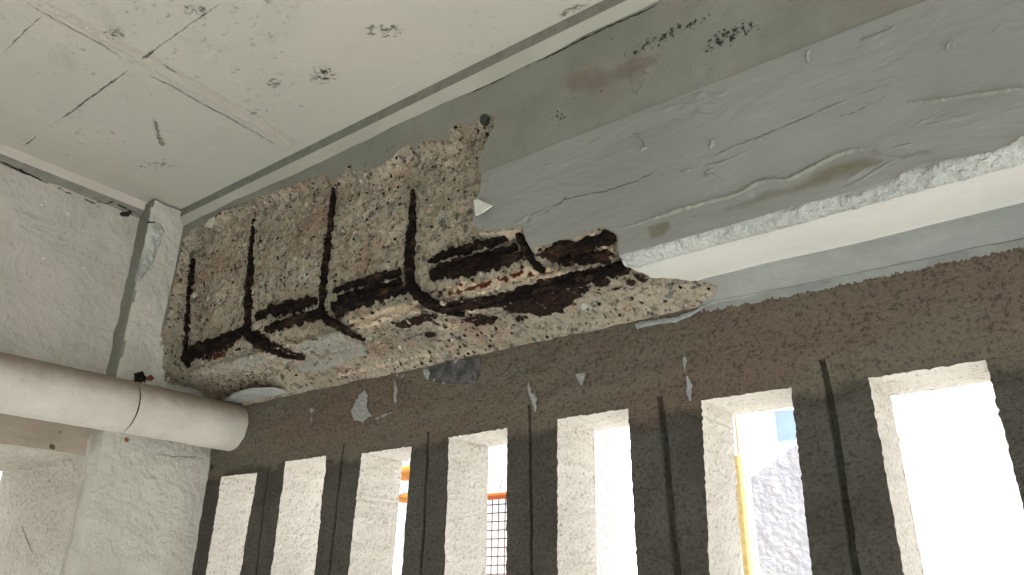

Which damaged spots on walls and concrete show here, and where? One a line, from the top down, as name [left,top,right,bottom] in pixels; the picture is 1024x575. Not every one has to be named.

crack [13,9,124,117]
crack [143,9,265,139]
rust [183,256,306,369]
spalling [133,114,717,406]
rust [344,271,648,338]